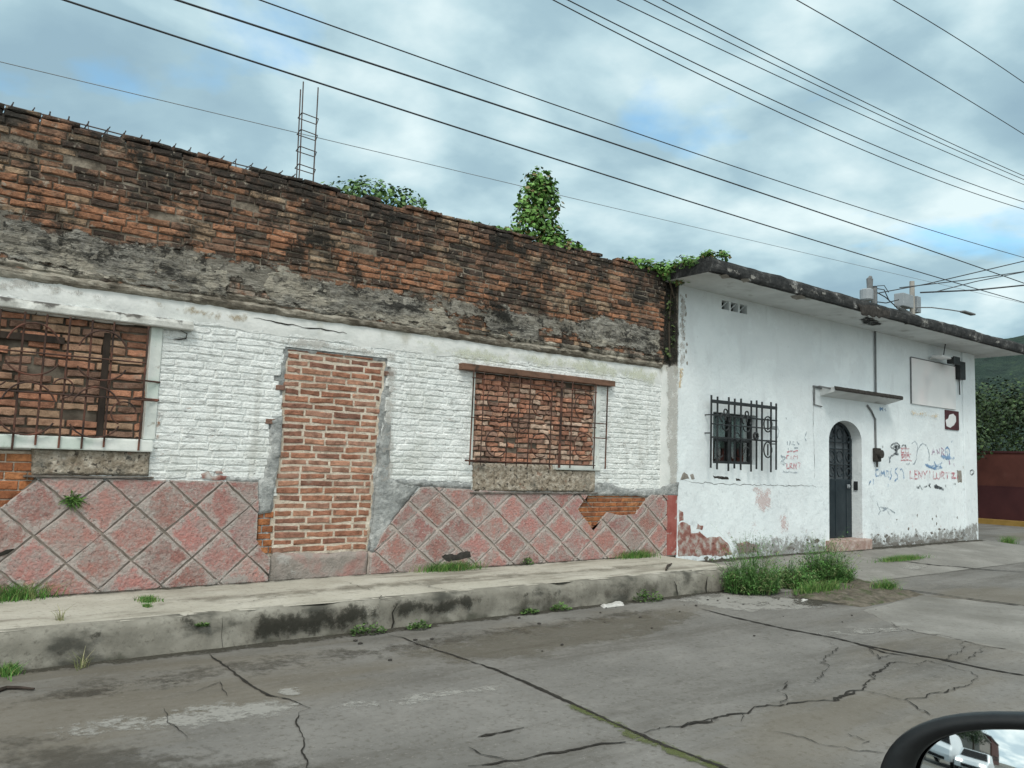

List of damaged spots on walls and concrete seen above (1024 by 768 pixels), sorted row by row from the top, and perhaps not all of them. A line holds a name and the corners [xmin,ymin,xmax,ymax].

crack [259,318,347,334]
flaking render [578,496,645,528]
peeling [677,510,755,560]
leakage [733,537,826,558]
leakage [872,523,978,547]
leakage [254,603,376,639]
leakage [396,595,481,617]
crack [778,630,984,714]
crack [295,709,308,768]
crack [681,719,716,727]